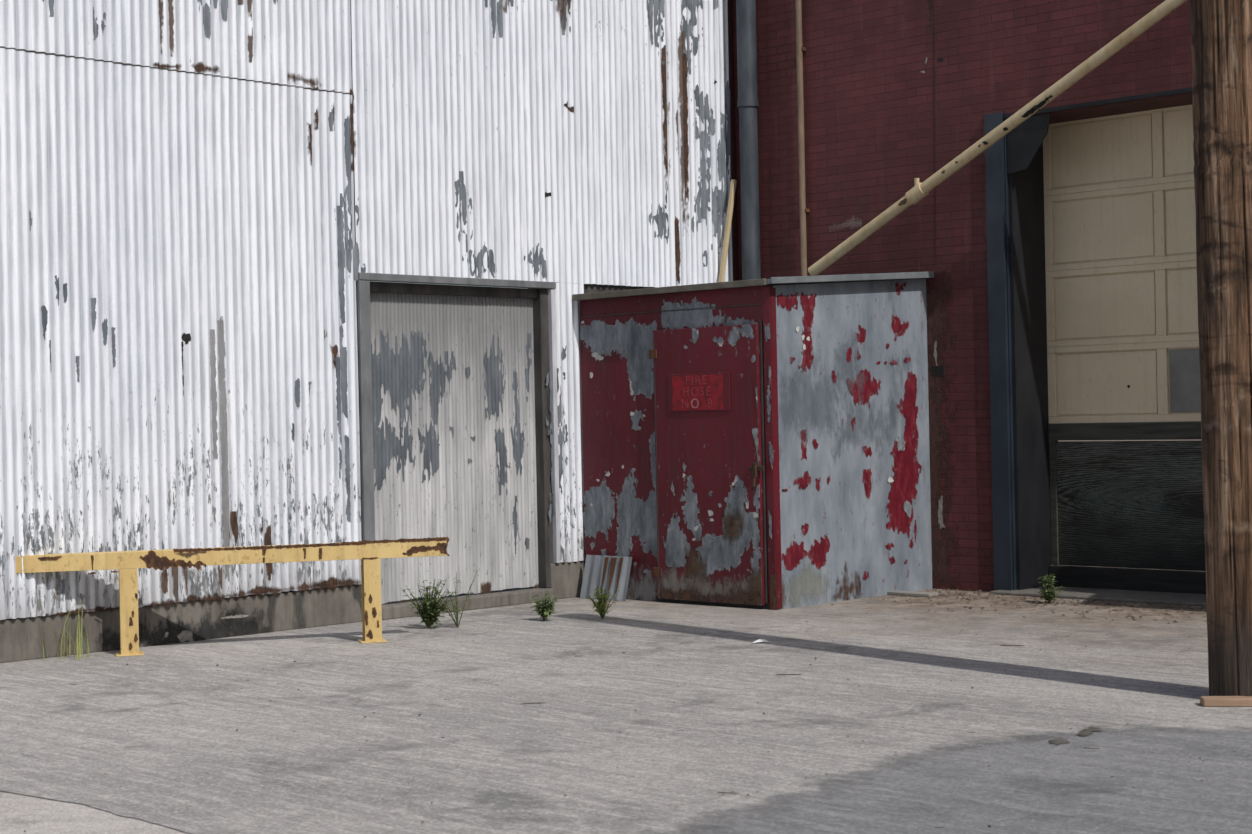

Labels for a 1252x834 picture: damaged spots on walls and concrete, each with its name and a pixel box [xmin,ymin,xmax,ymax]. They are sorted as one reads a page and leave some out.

corrosion [154,0,218,73]
corrosion [238,0,253,62]
peeling [551,0,571,35]
peeling [646,0,665,65]
corrosion [288,74,318,89]
corrosion [308,90,335,164]
peeling [679,0,731,267]
peeling [371,330,532,554]
peeling [579,292,831,610]
spalling [832,271,958,590]
corrosion [140,511,450,639]
corrosion [46,593,138,650]